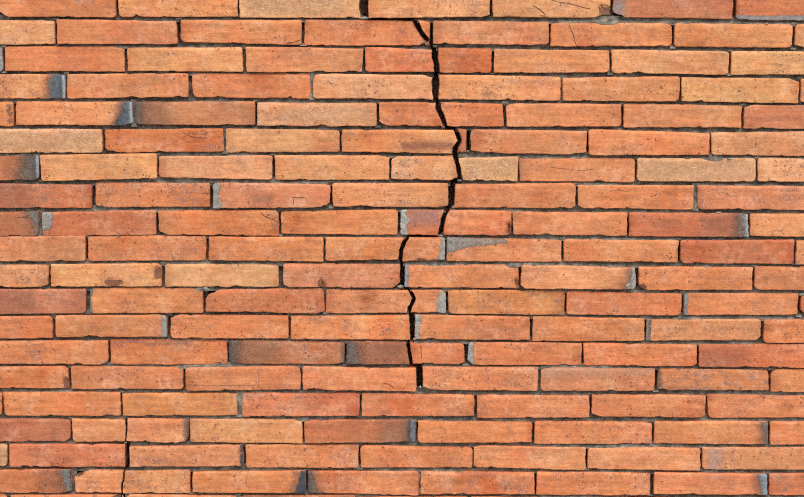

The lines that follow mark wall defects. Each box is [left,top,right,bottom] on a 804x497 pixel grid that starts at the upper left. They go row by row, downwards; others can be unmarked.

crack [359,0,471,390]